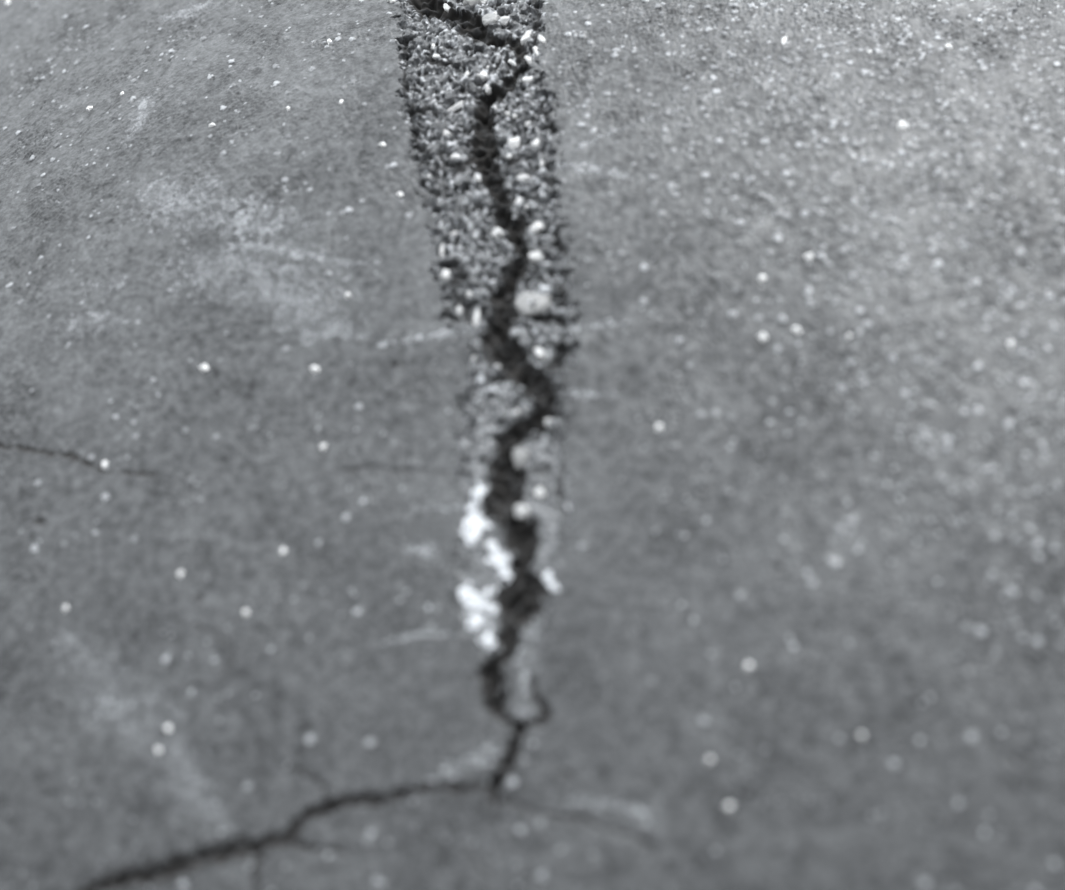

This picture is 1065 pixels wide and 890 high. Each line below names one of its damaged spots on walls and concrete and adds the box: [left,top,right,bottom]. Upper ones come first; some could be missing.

crack [0,441,158,478]
crack [75,0,658,890]
spalling [387,0,581,668]